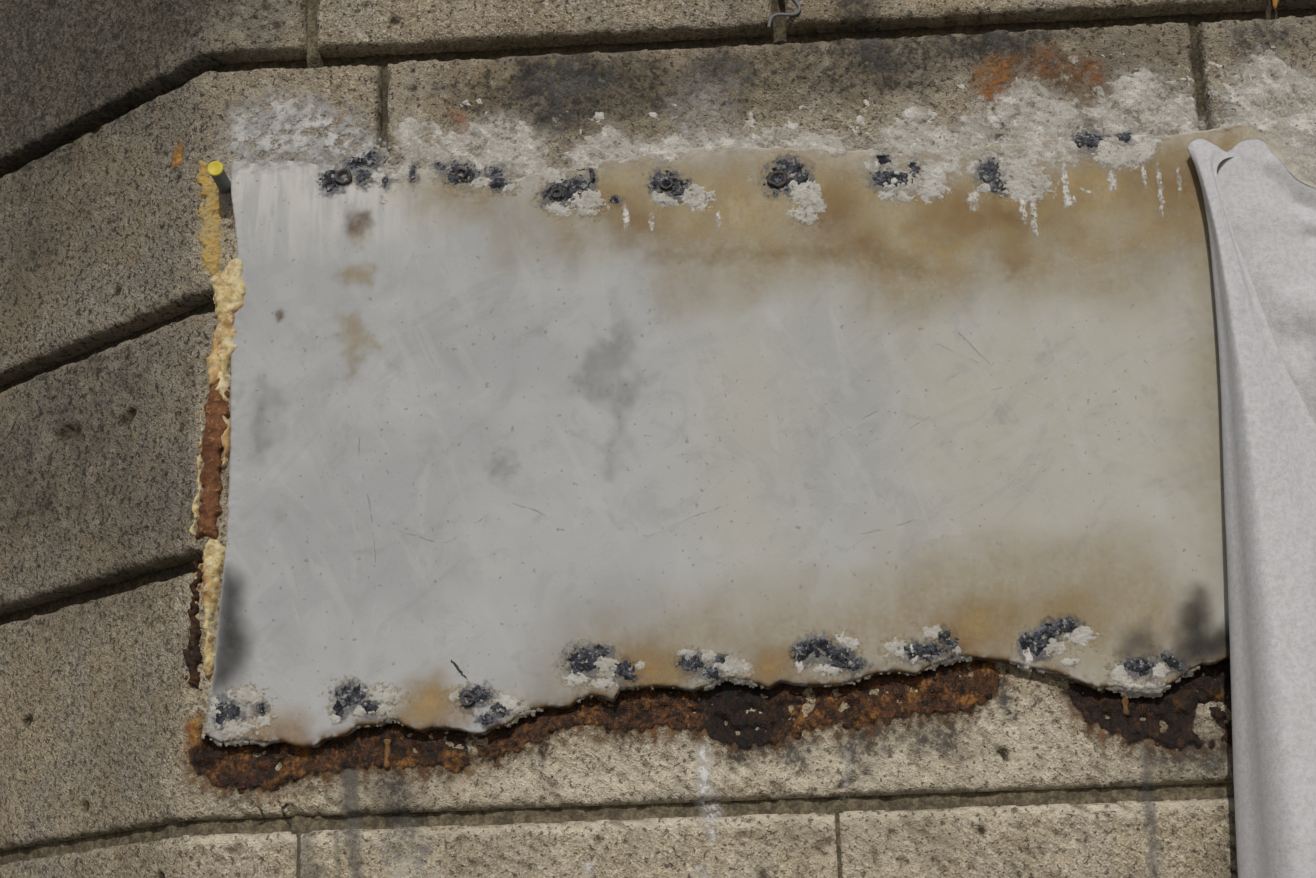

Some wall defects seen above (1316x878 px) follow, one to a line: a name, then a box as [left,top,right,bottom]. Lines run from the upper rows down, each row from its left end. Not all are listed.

rust [974,55,1015,100]
leakage [390,21,1316,298]
leakage [349,214,368,236]
rust [185,650,1007,804]
rust [1053,659,1233,763]